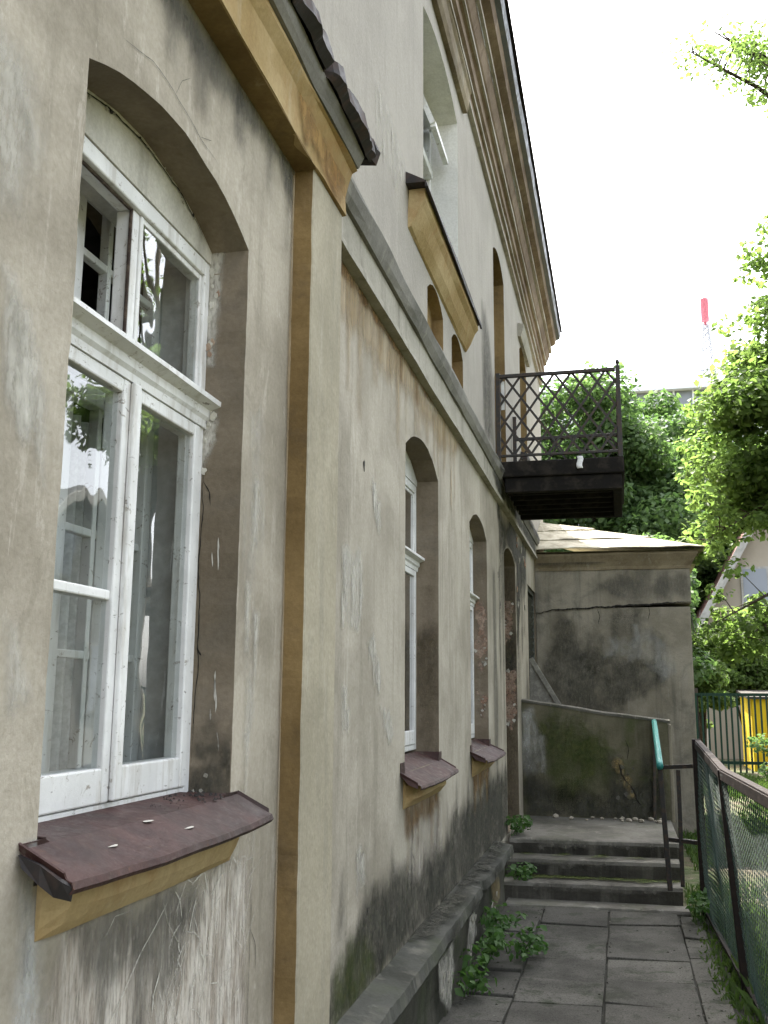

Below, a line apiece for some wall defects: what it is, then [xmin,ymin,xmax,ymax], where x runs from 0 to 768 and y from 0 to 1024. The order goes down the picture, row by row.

flaking render [206,253,223,365]
crack [191,475,210,760]
flaking render [474,600,487,671]
crack [539,601,691,623]
flaking render [505,669,517,730]
leakage [329,706,661,1024]